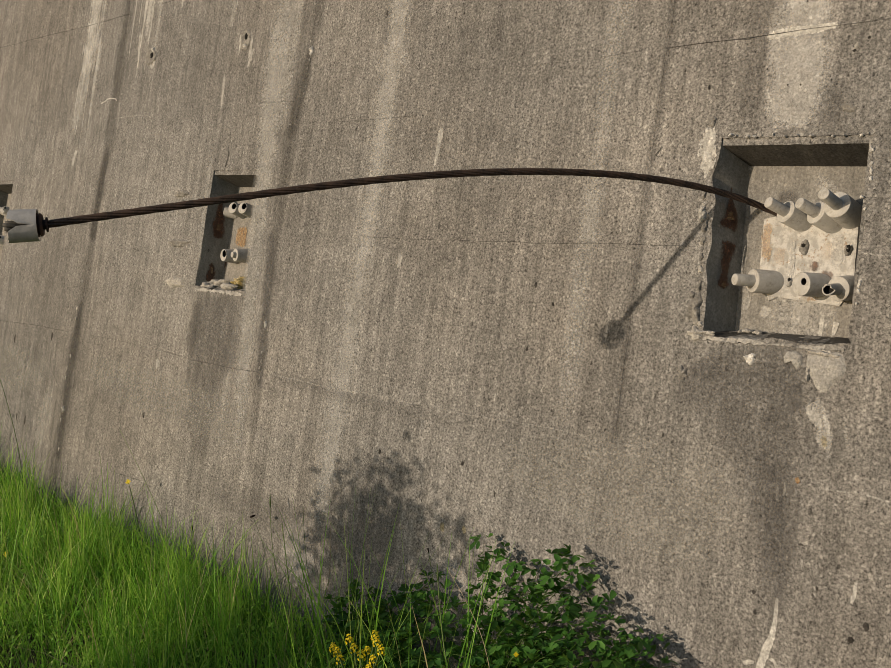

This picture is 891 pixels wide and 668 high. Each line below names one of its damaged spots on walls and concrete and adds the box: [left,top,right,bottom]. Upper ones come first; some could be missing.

damp [136,0,155,73]
rust [212,203,225,238]
rust [720,187,737,231]
rust [718,241,736,289]